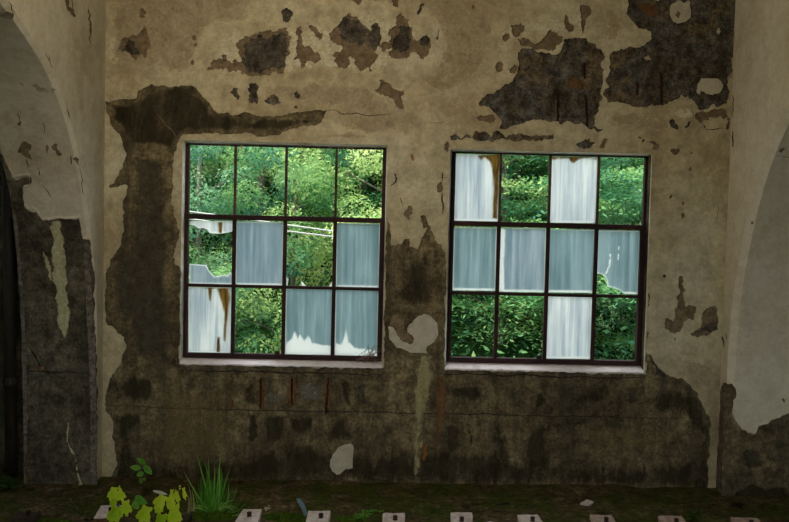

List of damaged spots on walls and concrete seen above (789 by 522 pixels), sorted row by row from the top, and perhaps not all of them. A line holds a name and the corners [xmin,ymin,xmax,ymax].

flaking render [118,8,151,61]
flaking render [207,0,439,110]
flaking render [444,0,735,152]
flaking render [1,84,789,496]
water stain [111,413,153,477]
water stain [114,377,151,401]
water stain [167,355,709,487]